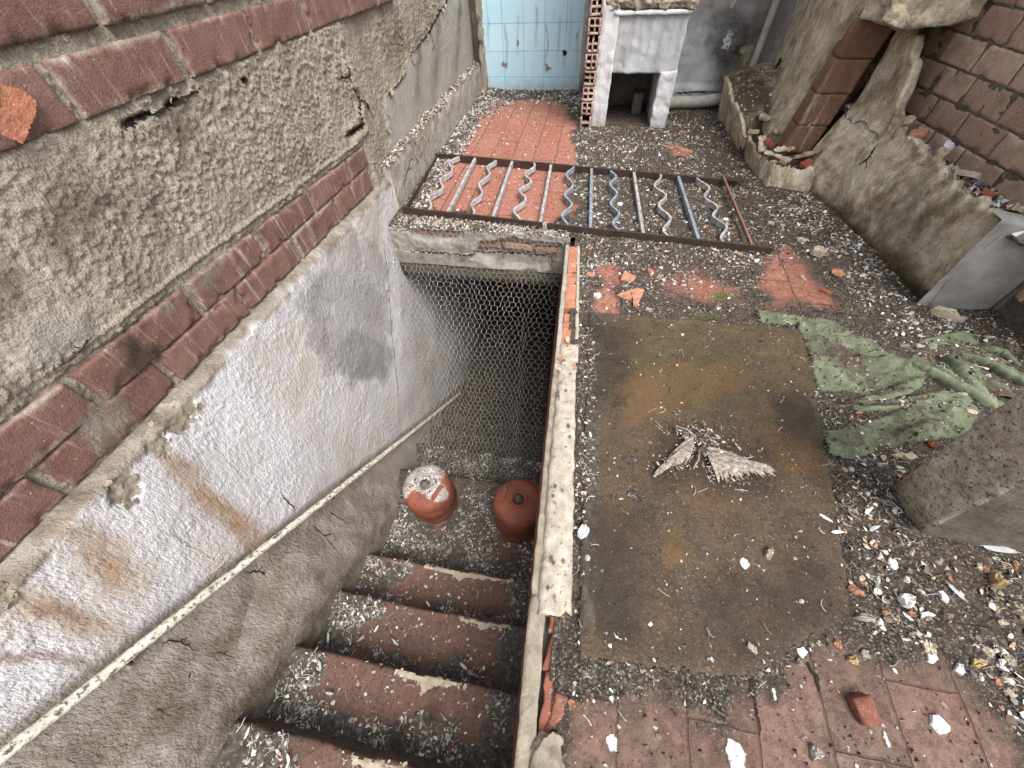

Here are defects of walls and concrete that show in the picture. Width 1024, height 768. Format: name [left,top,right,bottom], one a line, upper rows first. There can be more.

crack [339,0,448,137]
spalling [0,84,37,144]
crack [121,87,211,129]